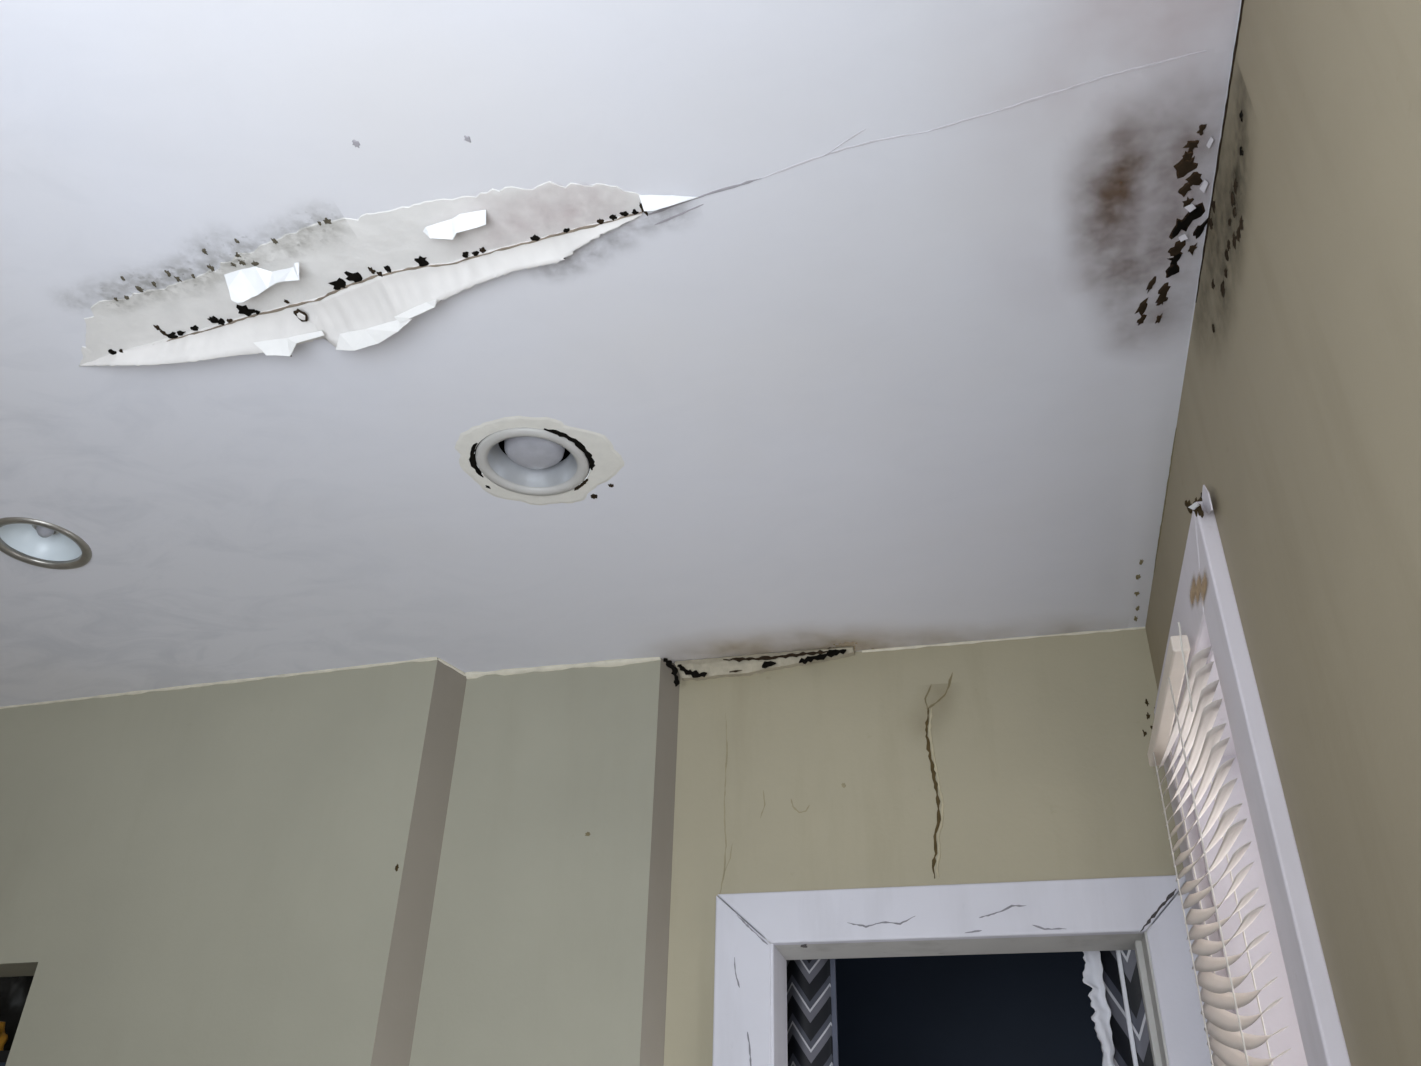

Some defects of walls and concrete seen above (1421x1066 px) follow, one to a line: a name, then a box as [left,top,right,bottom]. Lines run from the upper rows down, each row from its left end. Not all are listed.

damp [113,248,215,301]
peeling [79,181,698,367]
crack [649,0,1244,303]
damp [1096,154,1143,227]
damp [1135,124,1244,325]
crack [1154,427,1177,572]
crack [924,672,953,879]